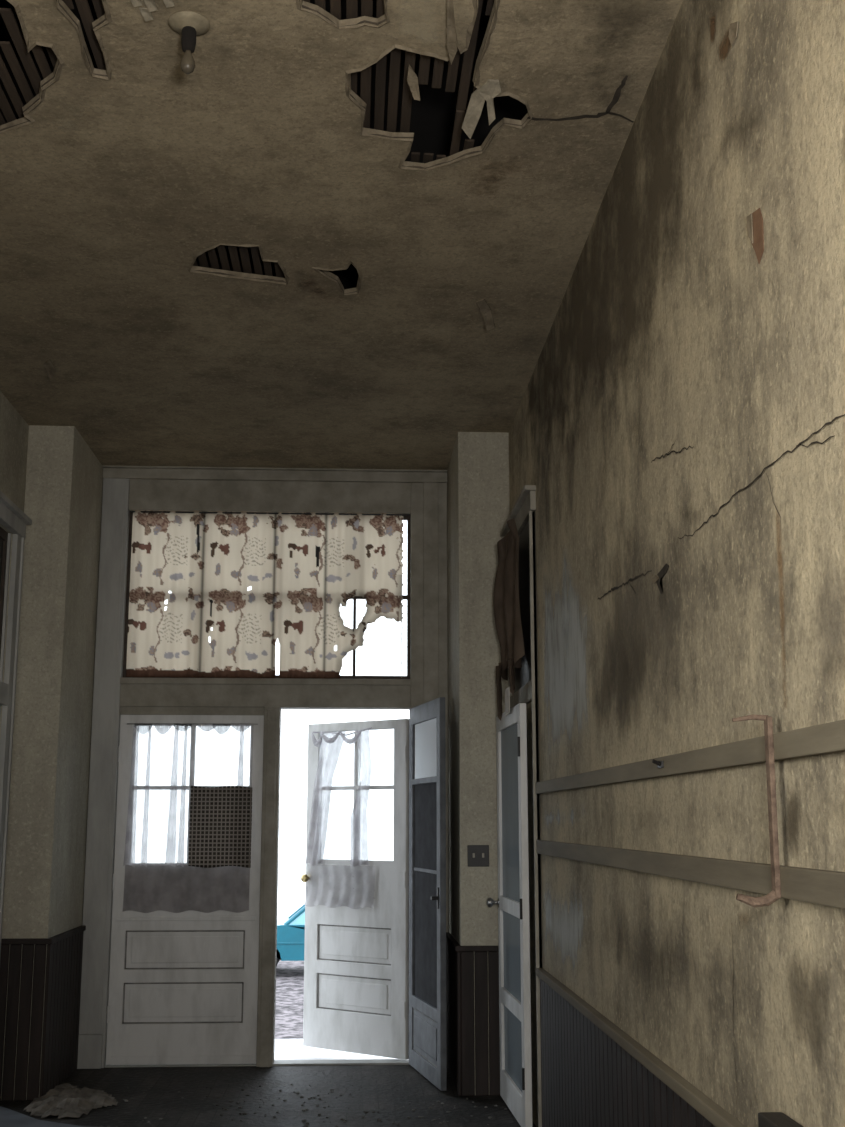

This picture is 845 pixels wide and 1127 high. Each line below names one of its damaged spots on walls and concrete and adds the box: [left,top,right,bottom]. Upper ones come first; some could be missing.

flaking render [296,0,390,29]
flaking render [53,0,112,80]
flaking render [345,0,534,171]
flaking render [188,243,290,285]
crack [652,440,693,461]
crack [679,414,845,542]
crack [598,570,652,600]